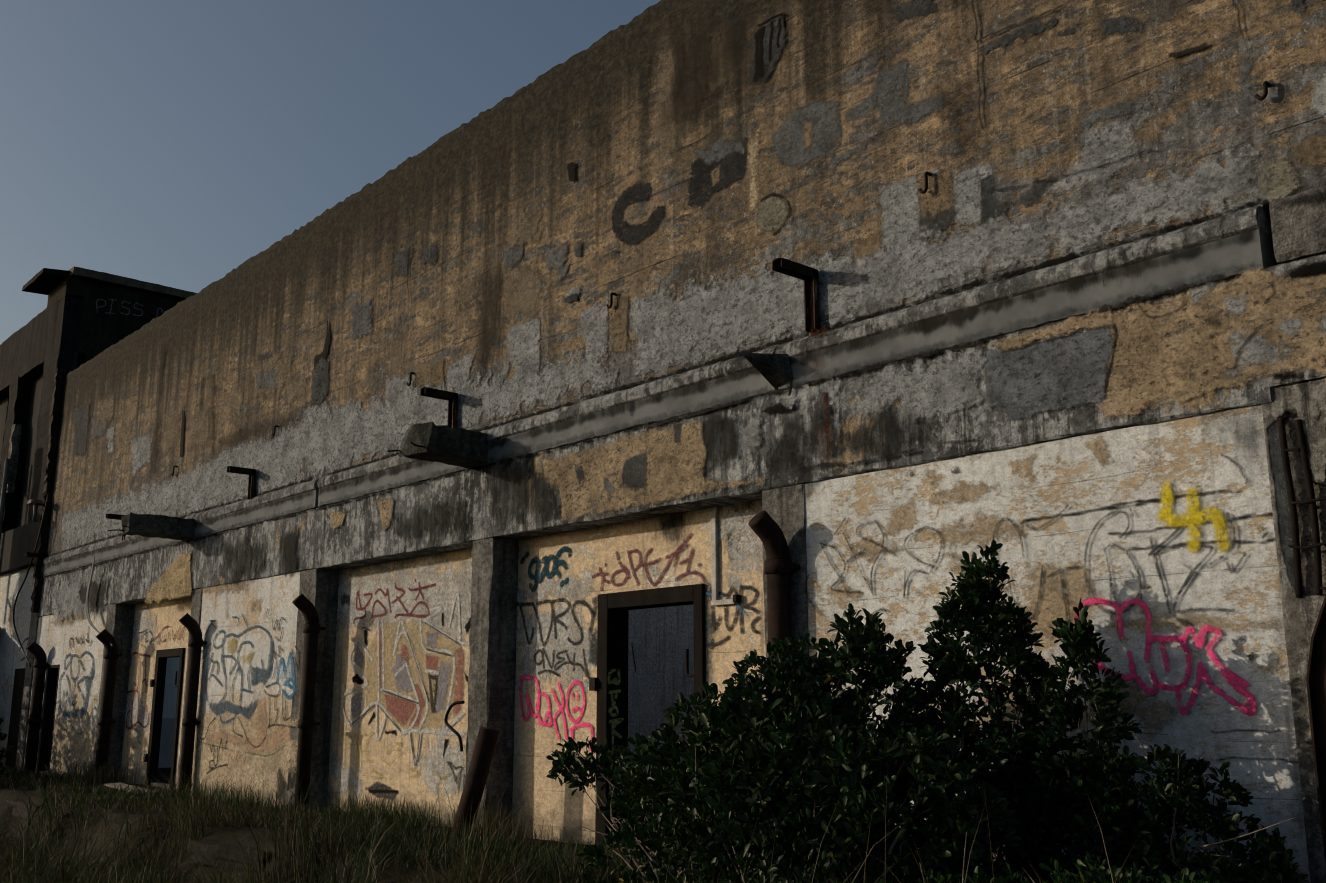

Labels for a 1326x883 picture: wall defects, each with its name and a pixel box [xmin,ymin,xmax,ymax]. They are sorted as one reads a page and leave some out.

damp [1059,245,1201,290]
damp [1217,228,1253,245]
peeling [30,100,1326,654]
damp [786,292,1073,386]
damp [759,403,931,496]
peeling [515,564,598,697]
peeling [123,688,151,739]